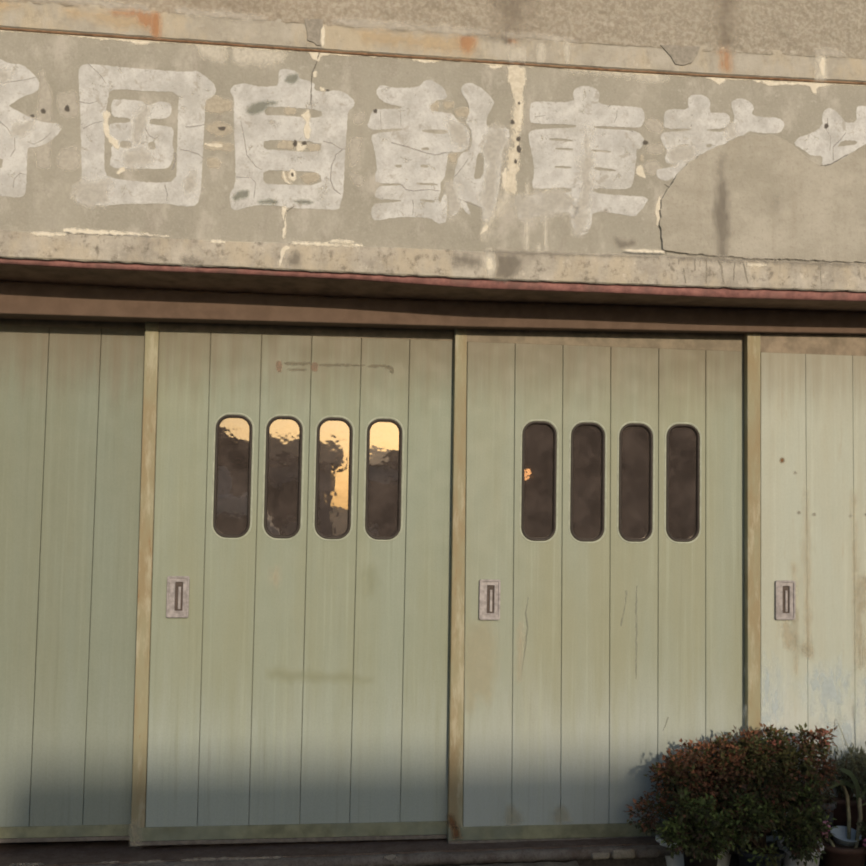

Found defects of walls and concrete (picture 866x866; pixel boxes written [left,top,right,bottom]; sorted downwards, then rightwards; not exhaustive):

corrosion [113,11,159,36]
leakage [0,30,292,64]
leakage [331,53,443,63]
spalling [660,45,700,66]
leakage [697,49,865,94]
crack [283,52,342,194]
leakage [459,0,683,236]
leakage [32,228,152,236]
crack [279,206,294,266]
leakage [289,240,362,265]
leakage [604,180,777,284]